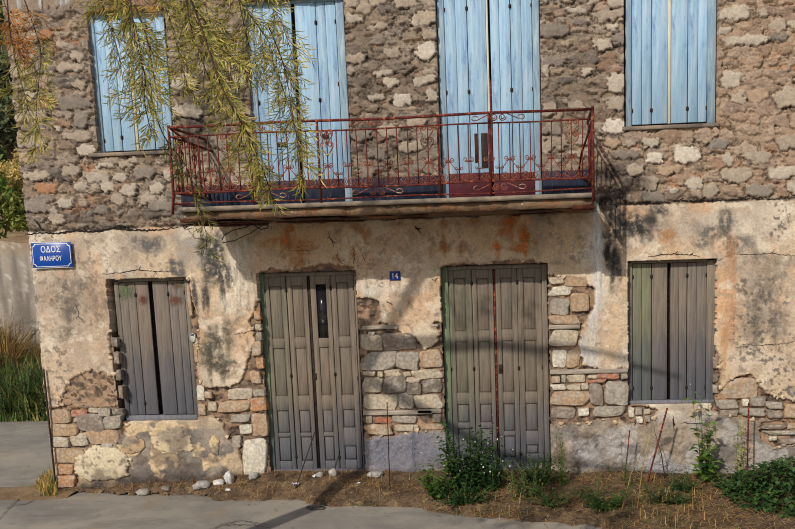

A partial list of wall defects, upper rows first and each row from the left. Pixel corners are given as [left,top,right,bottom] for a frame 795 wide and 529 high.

flaking render [46,329,130,488]
damp [192,283,209,310]
flaking render [186,277,271,474]
flaking render [357,296,446,440]
flaking render [547,275,657,427]
flaking render [711,351,795,449]